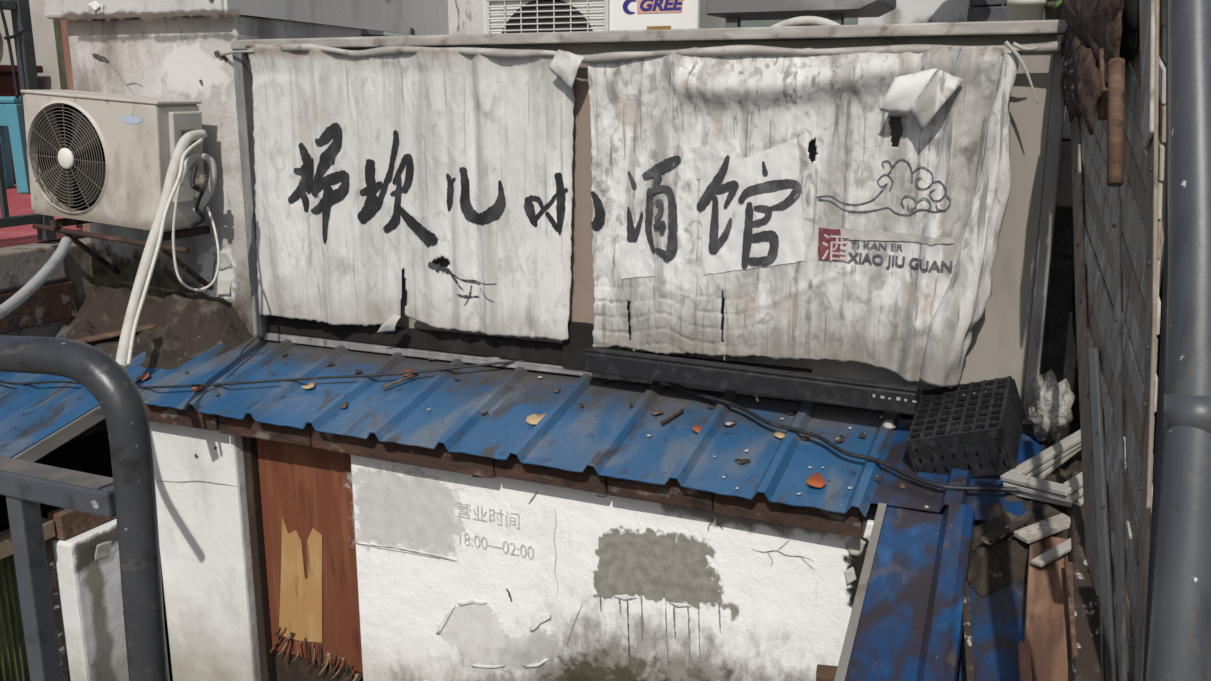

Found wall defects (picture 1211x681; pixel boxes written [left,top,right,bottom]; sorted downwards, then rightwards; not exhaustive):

crack [752,540,814,569]
water stain [85,559,116,681]
water stain [478,619,804,681]
water stain [722,604,739,620]